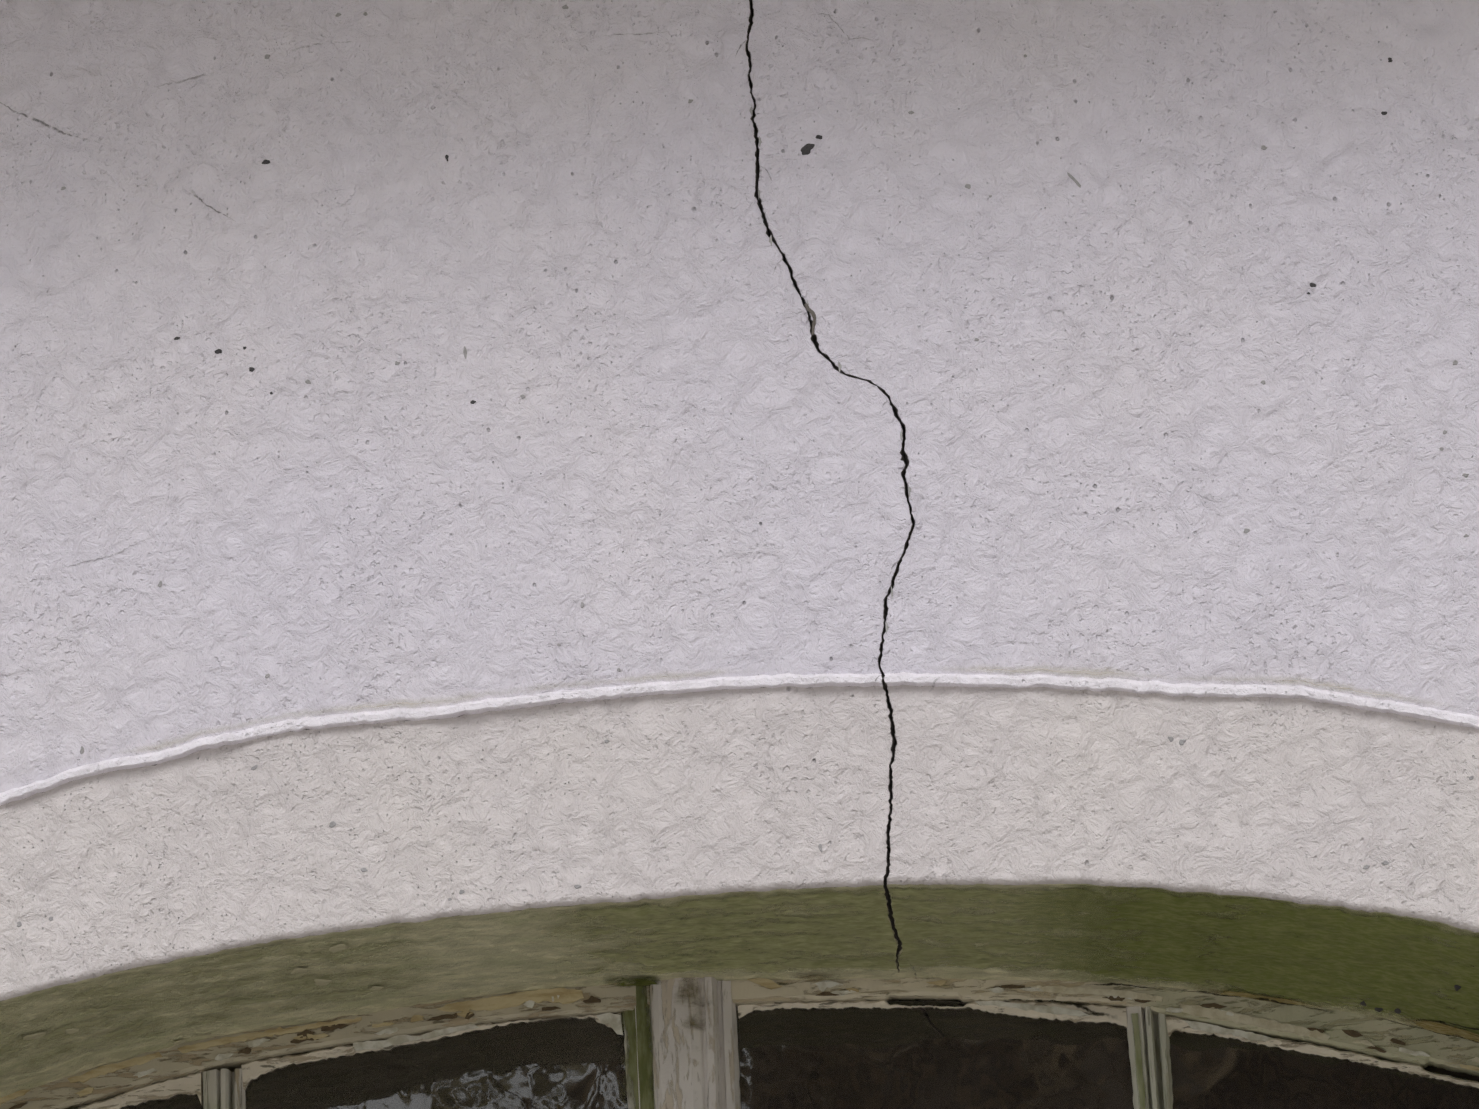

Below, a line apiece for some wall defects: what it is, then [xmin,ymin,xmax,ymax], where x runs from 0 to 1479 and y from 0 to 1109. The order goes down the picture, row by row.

crack [737,0,922,975]